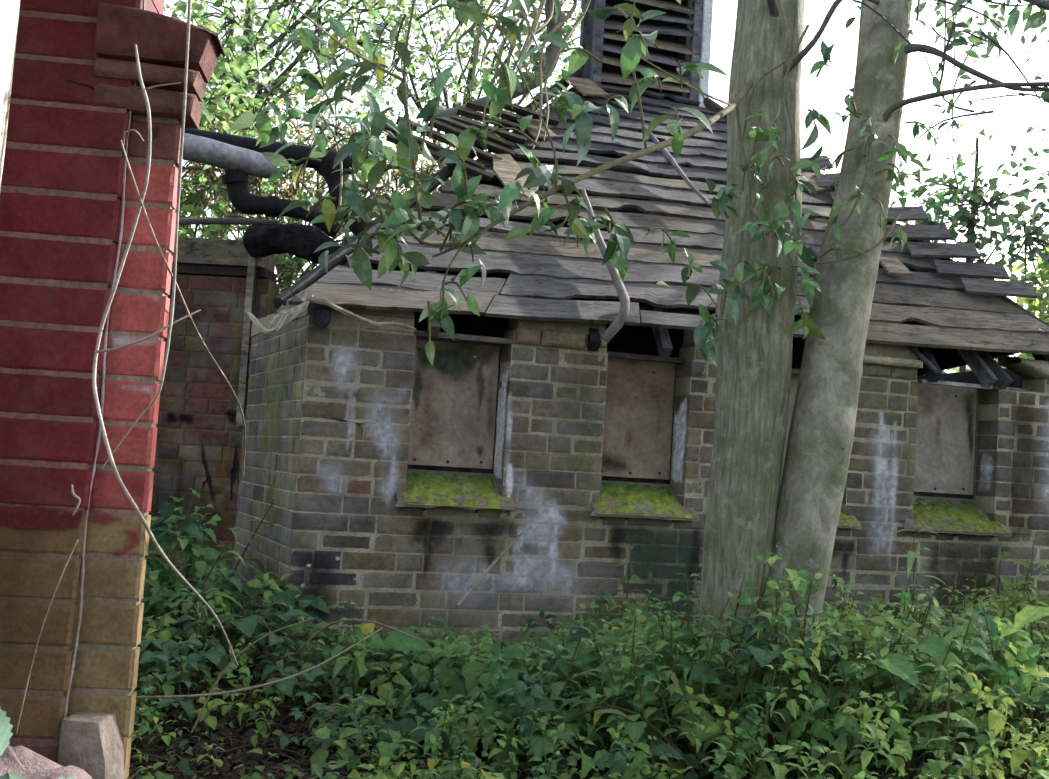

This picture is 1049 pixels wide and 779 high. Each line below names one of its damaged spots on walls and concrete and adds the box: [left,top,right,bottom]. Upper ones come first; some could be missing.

damp [335,350,352,381]
damp [372,423,396,494]
damp [876,459,896,506]
peeling [0,490,120,530]
damp [415,519,450,565]
damp [471,489,570,585]